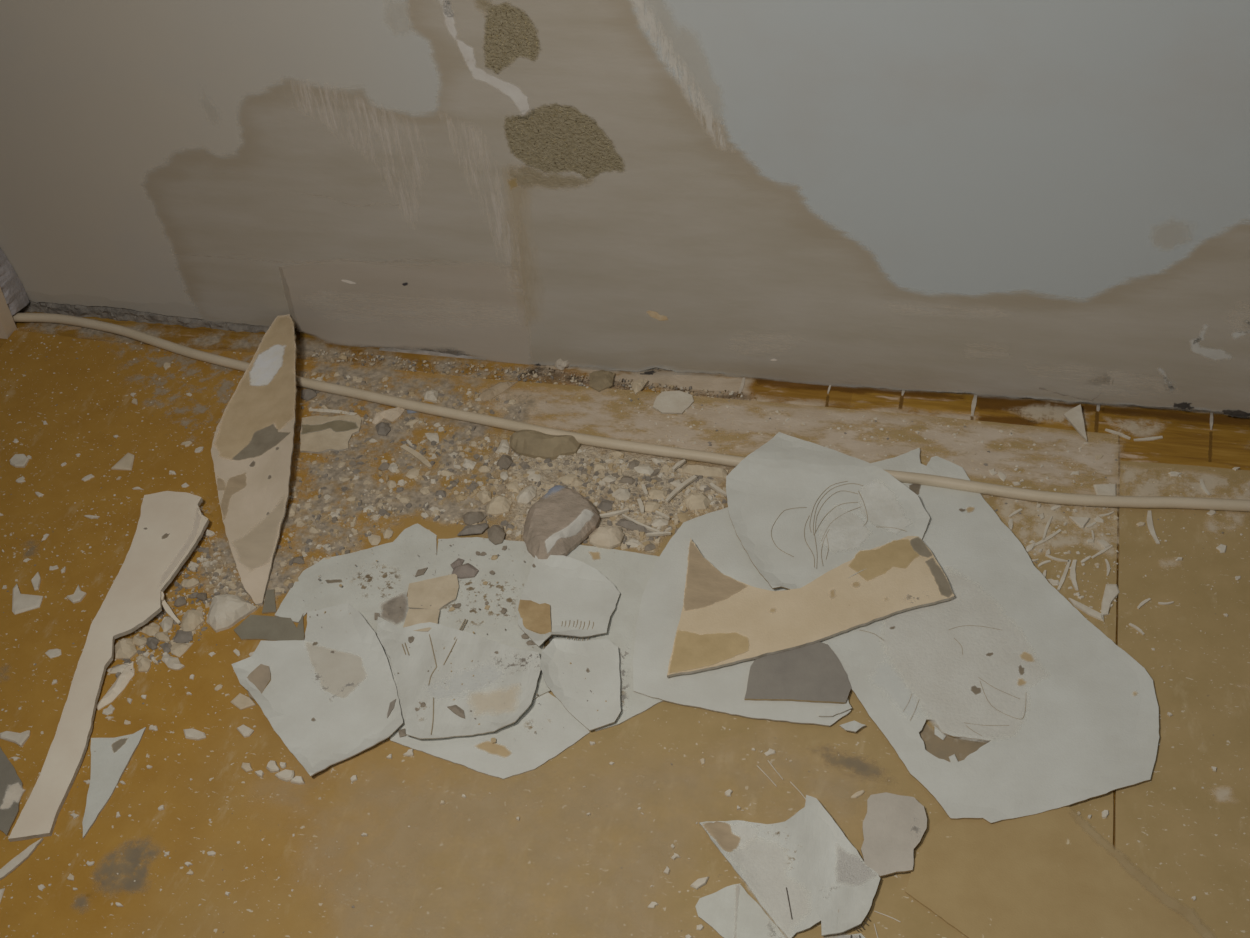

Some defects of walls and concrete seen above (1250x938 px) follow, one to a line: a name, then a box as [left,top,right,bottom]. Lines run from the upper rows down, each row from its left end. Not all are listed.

flaking render [20,0,1250,417]